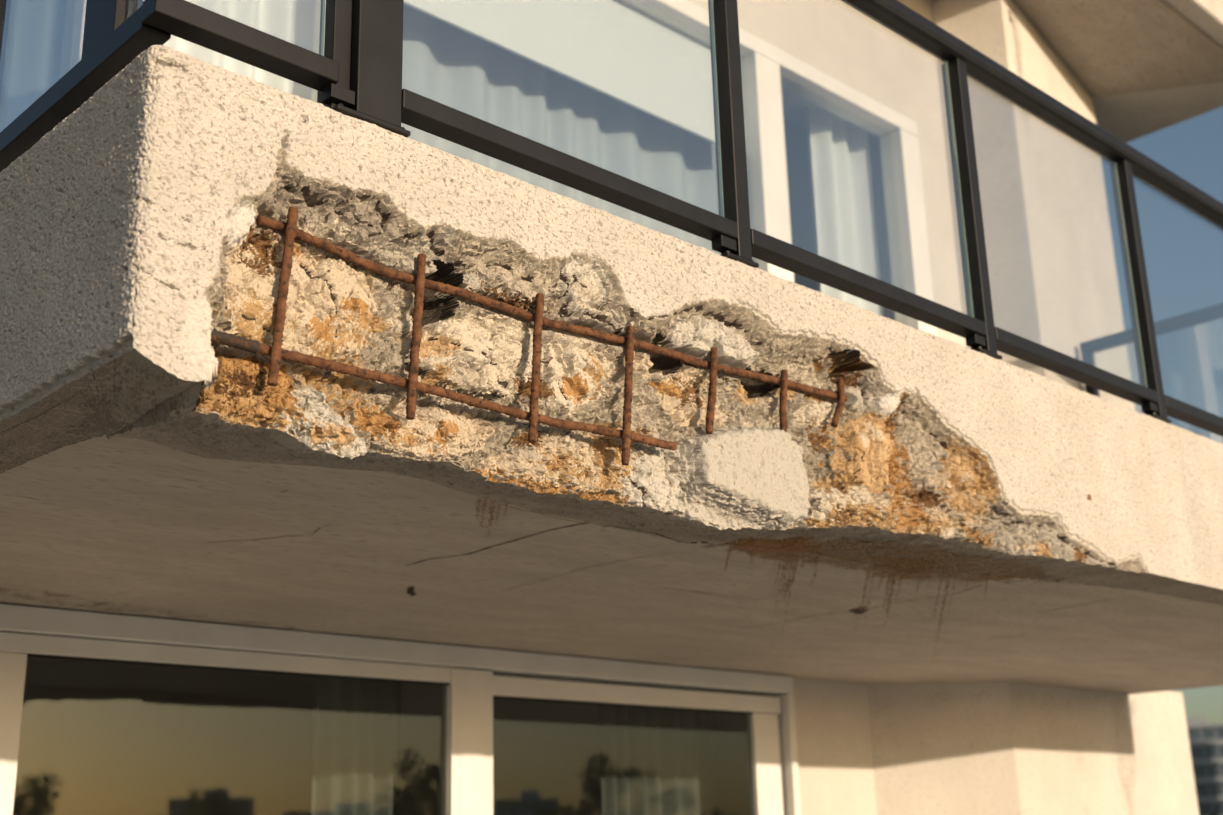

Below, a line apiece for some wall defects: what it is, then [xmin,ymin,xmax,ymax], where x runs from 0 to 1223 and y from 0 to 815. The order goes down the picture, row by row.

corrosion [479,278,535,313]
corrosion [191,224,470,456]
corrosion [508,376,556,401]
corrosion [582,341,623,400]
spalling [169,147,1149,573]
corrosion [670,375,763,410]
corrosion [469,421,650,507]
crack [407,457,712,566]
corrosion [1033,540,1054,557]